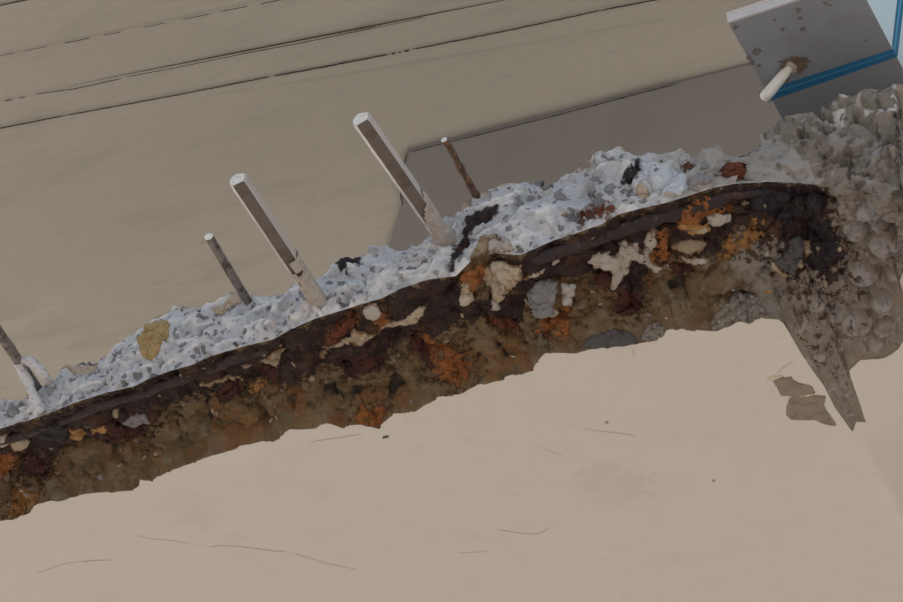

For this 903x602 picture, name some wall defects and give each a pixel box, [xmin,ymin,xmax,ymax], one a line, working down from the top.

crack [0,0,656,129]
crack [404,83,679,163]
corrosion [620,157,642,186]
corrosion [0,162,871,521]
spalling [0,83,903,521]
crack [448,204,499,272]